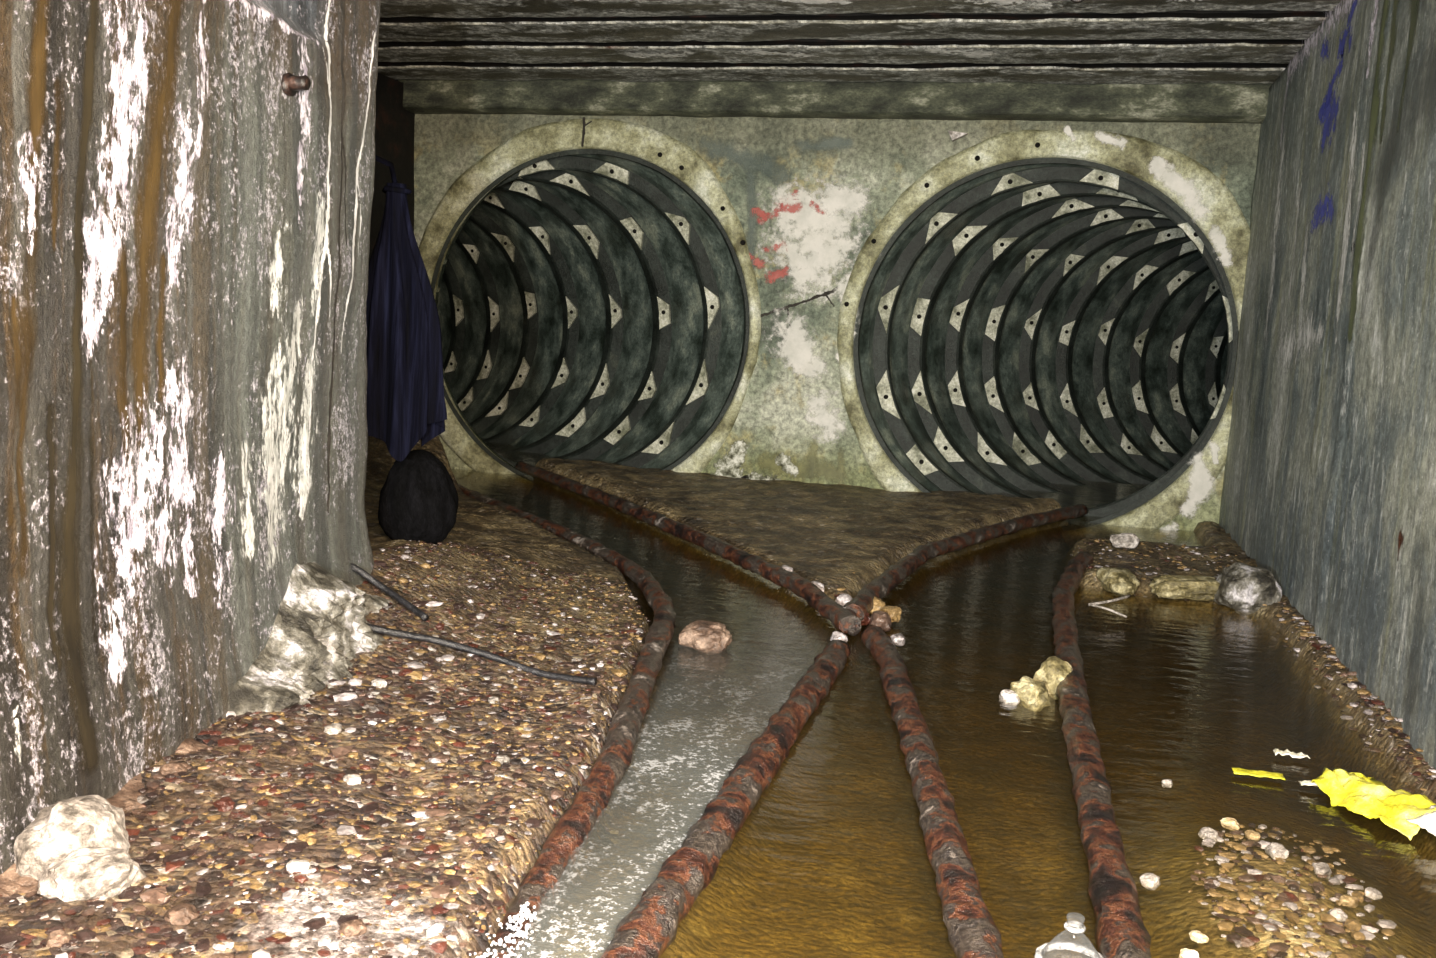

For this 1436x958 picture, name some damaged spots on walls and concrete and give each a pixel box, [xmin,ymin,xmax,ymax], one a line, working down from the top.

damp [18,132,44,255]
corrosion [9,0,61,578]
corrosion [118,0,184,457]
damp [46,0,395,773]
damp [0,863,39,897]
damp [106,774,146,814]